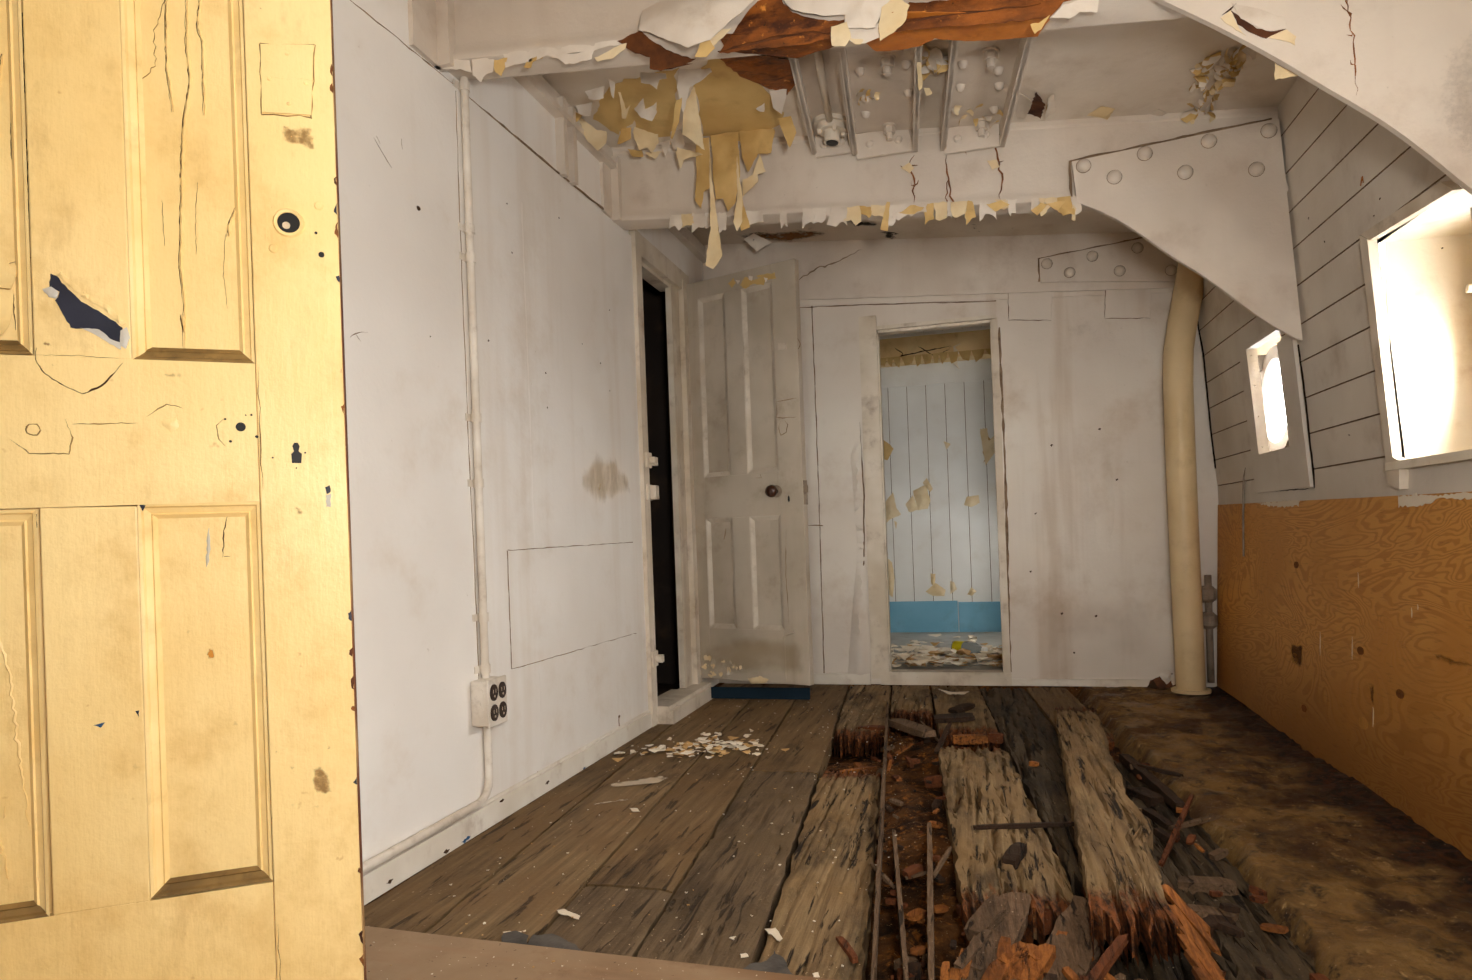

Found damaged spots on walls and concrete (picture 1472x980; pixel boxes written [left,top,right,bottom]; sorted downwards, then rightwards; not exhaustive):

peeling [1030,0,1099,34]
peeling [1150,2,1298,124]
crack [1341,0,1358,94]
peeling [442,0,1082,269]
spalling [325,0,367,980]
peeling [700,655,769,684]
peeling [557,909,580,920]
peeling [765,928,783,941]